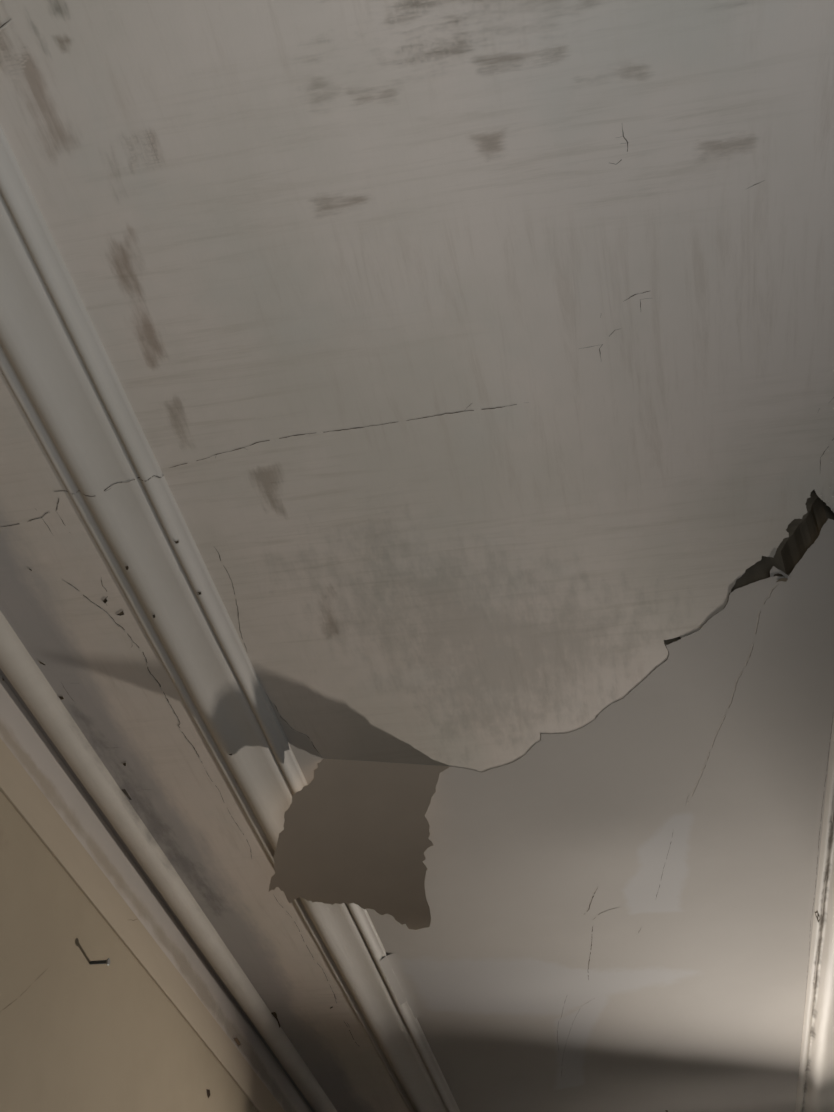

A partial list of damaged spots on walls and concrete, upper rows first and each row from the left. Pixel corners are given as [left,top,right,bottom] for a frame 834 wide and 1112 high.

crack [1,404,517,533]
peeling [269,758,454,930]